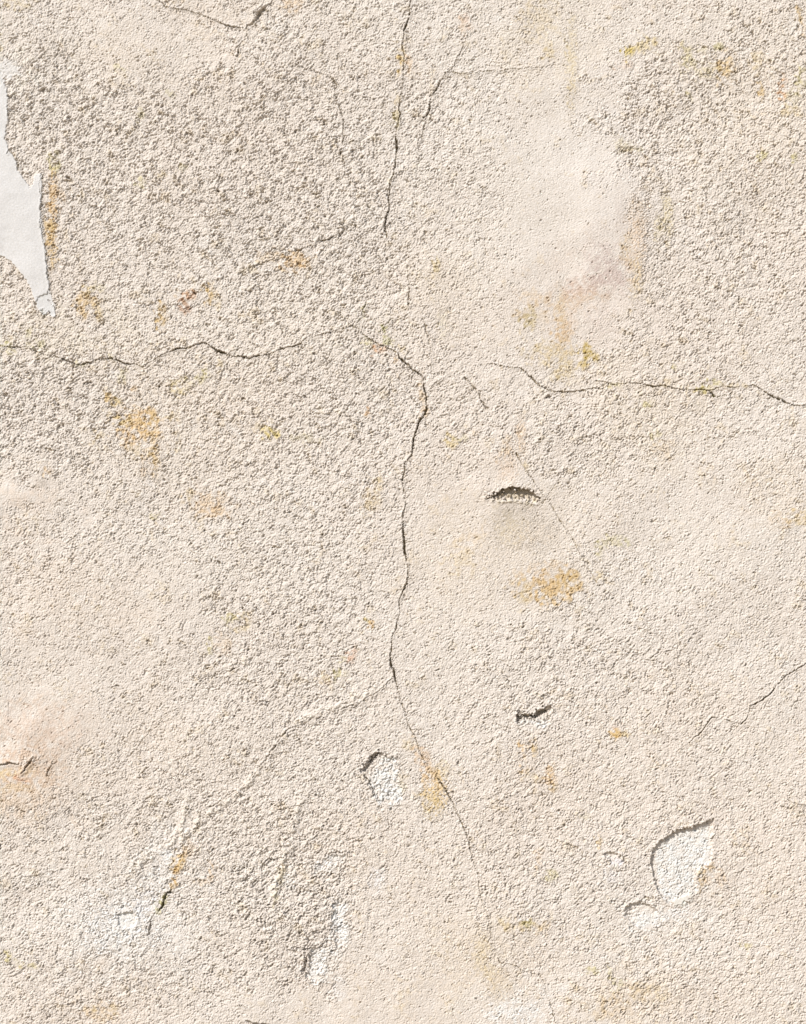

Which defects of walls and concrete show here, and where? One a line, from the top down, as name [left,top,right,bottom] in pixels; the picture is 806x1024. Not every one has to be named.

crack [156,0,275,64]
crack [295,0,541,238]
crack [6,148,57,318]
crack [239,211,346,275]
crack [0,274,806,1024]
spalling [513,694,555,731]
spalling [360,749,404,806]
spalling [623,818,715,931]